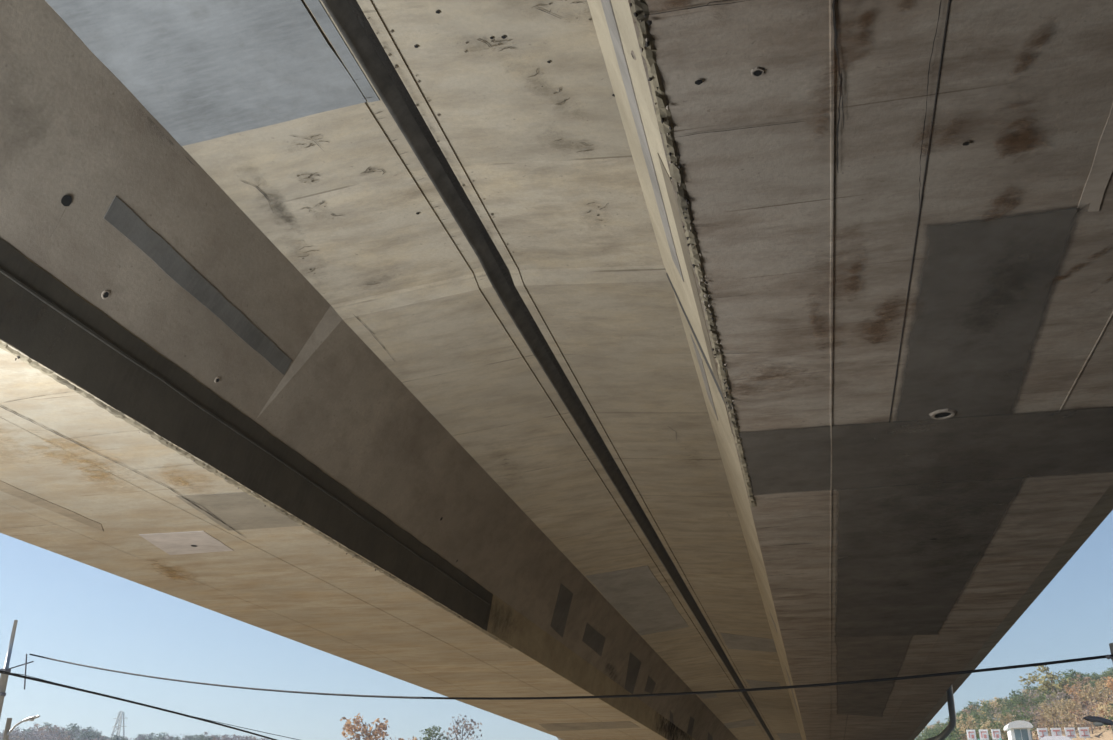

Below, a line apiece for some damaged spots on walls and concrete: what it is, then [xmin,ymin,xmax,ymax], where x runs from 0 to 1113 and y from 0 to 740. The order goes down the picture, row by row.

spalling [630,0,757,507]